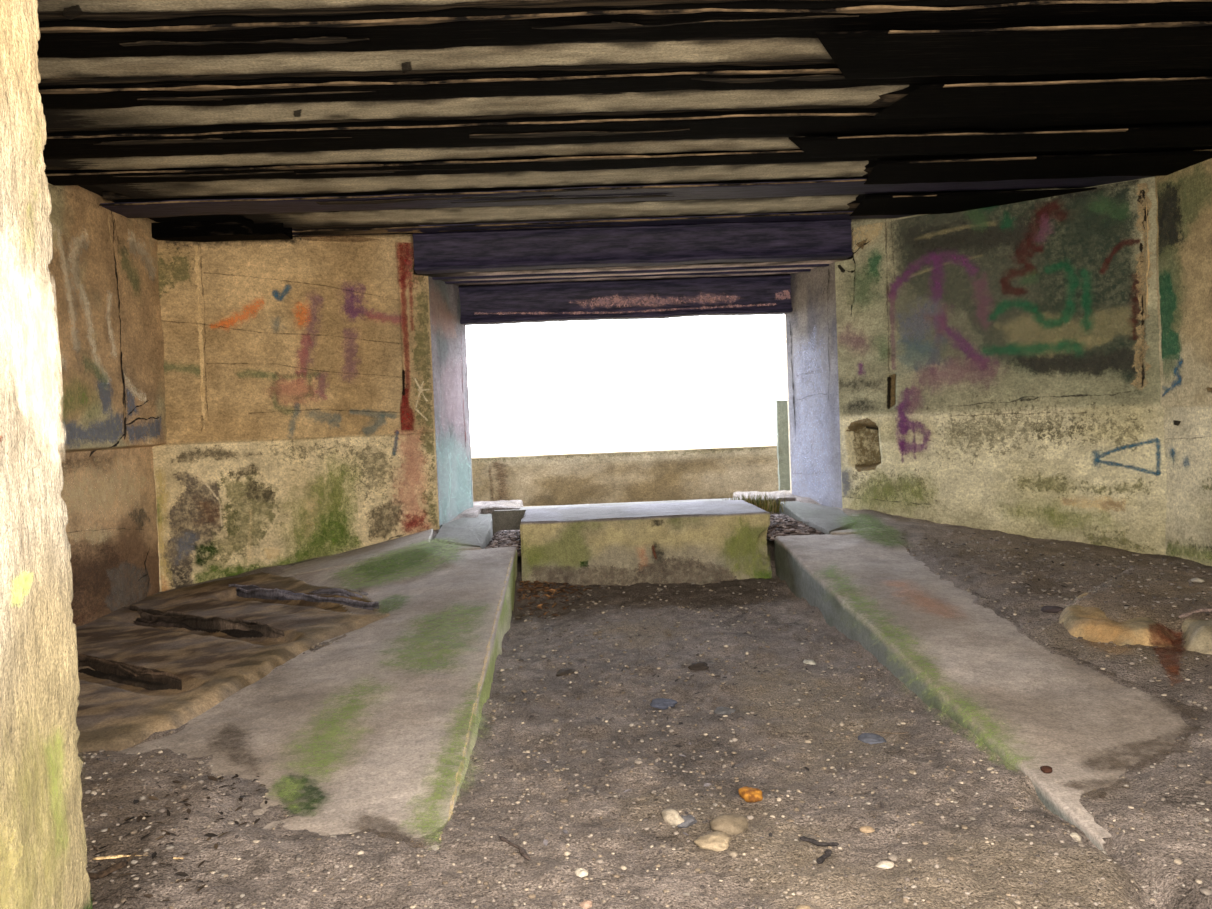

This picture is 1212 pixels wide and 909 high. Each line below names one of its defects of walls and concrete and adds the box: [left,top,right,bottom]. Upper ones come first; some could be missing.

crack [89,209,159,457]
damp [171,437,403,564]